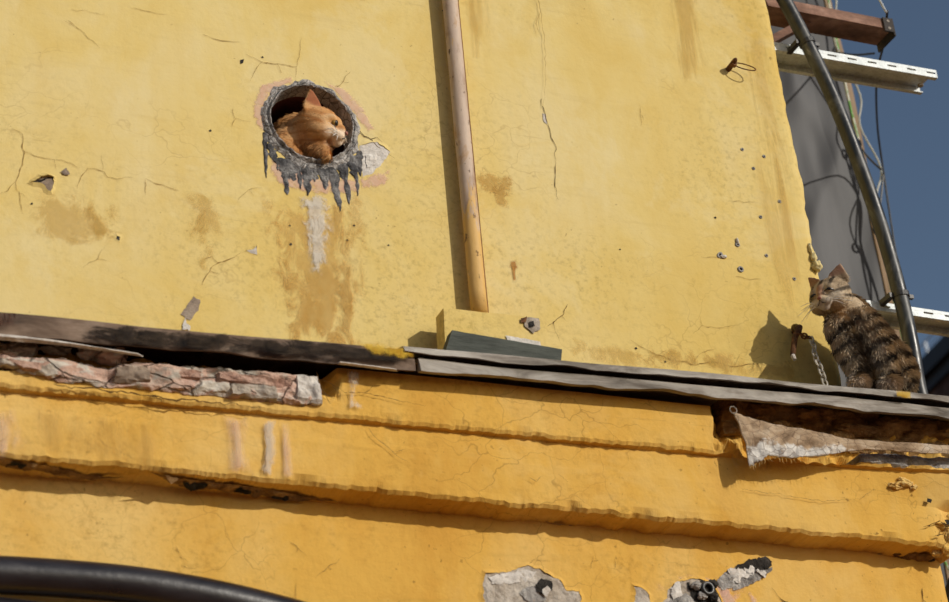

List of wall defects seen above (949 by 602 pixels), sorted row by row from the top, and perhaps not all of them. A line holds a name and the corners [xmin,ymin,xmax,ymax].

peeling [254,79,291,126]
peeling [272,85,394,193]
spalling [27,168,70,195]
water stain [303,196,330,269]
spalling [888,477,918,491]
spalling [881,514,949,562]
spalling [477,562,585,602]
spalling [629,556,772,602]